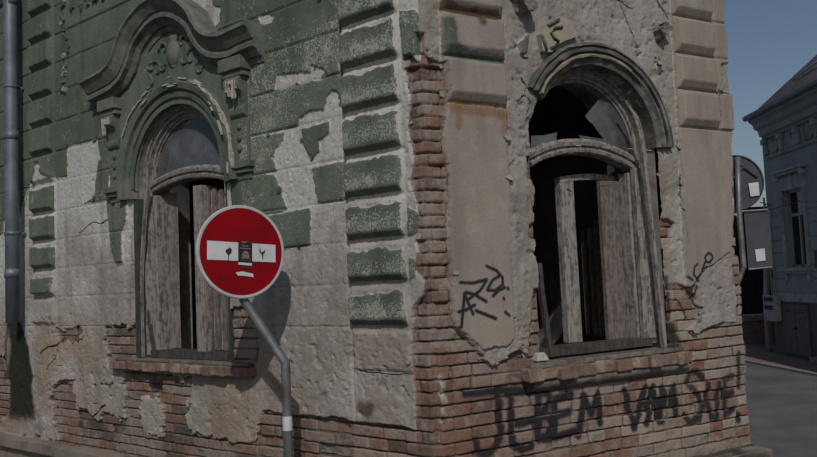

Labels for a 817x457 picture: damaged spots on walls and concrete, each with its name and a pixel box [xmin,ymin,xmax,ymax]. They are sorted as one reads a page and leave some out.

peeling [192,0,220,26]
crack [617,0,643,56]
crack [654,0,671,22]
peeling [274,64,327,90]
peeling [162,76,235,173]
peeling [65,139,101,208]
peeling [266,90,350,272]
crack [77,217,108,247]
flaking render [292,0,766,457]
leakage [5,322,34,419]
crack [38,336,65,372]
flaking render [49,370,284,457]